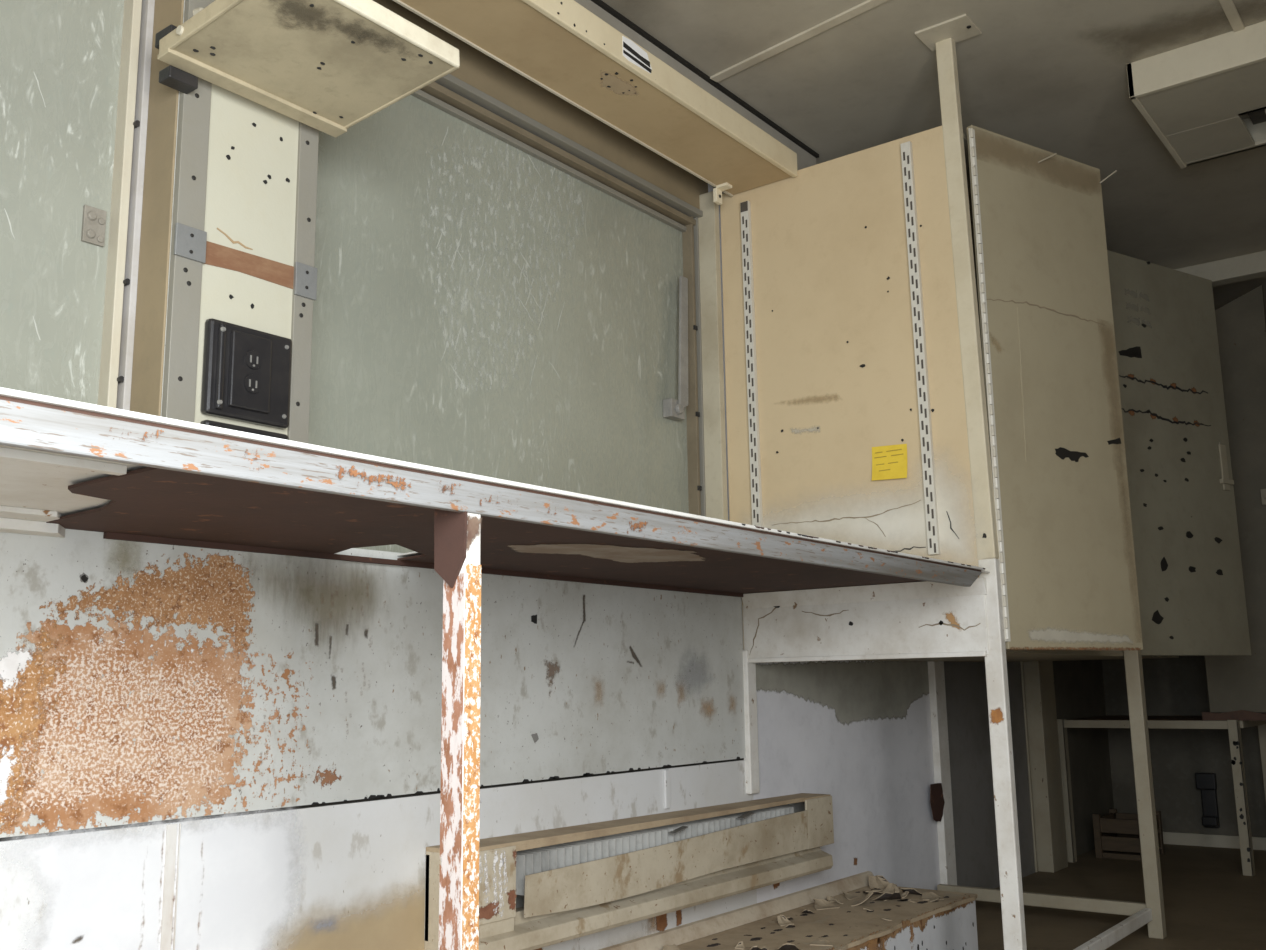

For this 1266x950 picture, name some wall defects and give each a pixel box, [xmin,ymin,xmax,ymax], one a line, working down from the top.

peeling [756,661,929,725]